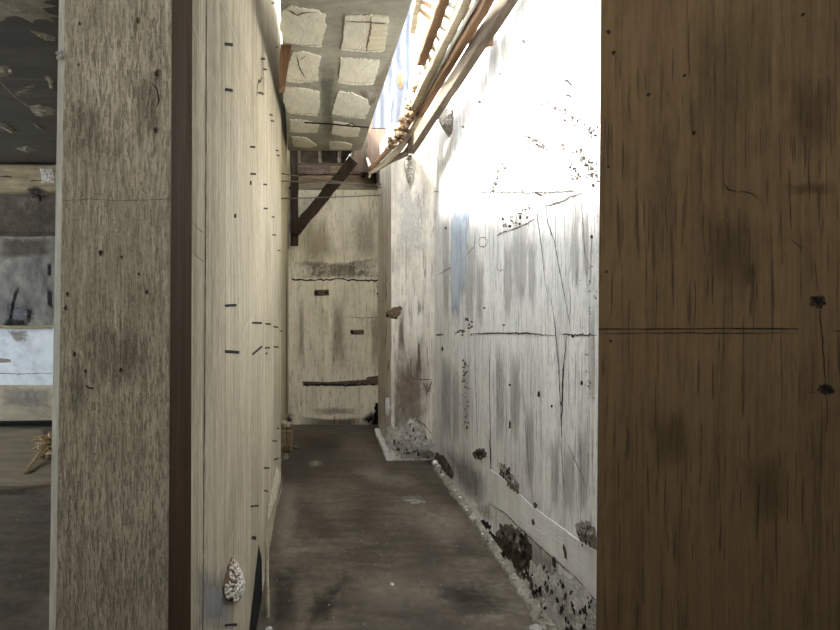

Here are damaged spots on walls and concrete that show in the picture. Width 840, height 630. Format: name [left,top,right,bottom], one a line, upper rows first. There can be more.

water stain [302,230,371,278]
water stain [451,150,469,311]
crack [438,119,593,498]
spalling [385,417,454,479]
crack [732,313,828,537]
spalling [481,519,597,630]